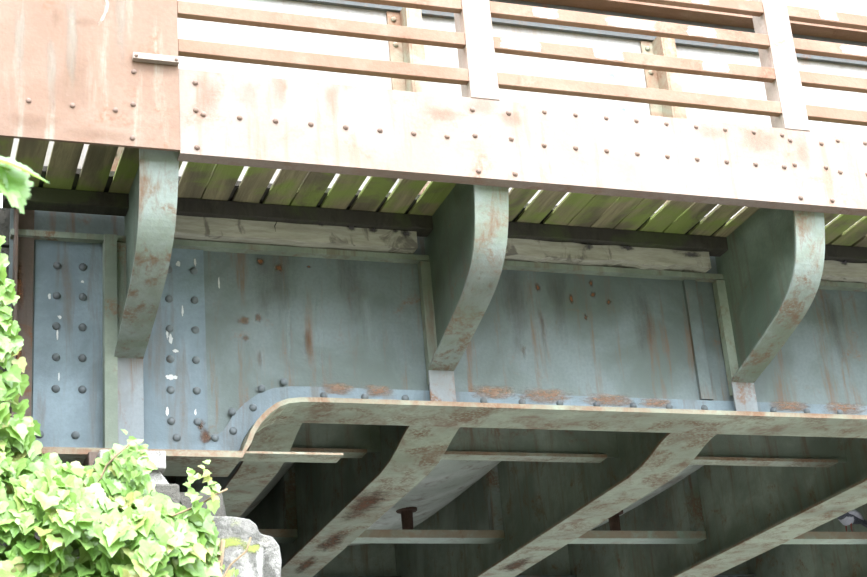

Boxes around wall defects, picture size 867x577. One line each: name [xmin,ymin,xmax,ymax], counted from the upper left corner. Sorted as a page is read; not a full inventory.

rust [325,383,352,394]
rust [477,386,513,399]
rust [524,389,567,401]
rust [591,395,629,406]
rust [777,402,808,411]
rust [346,492,385,520]
rust [320,535,341,549]
rust [503,559,527,571]